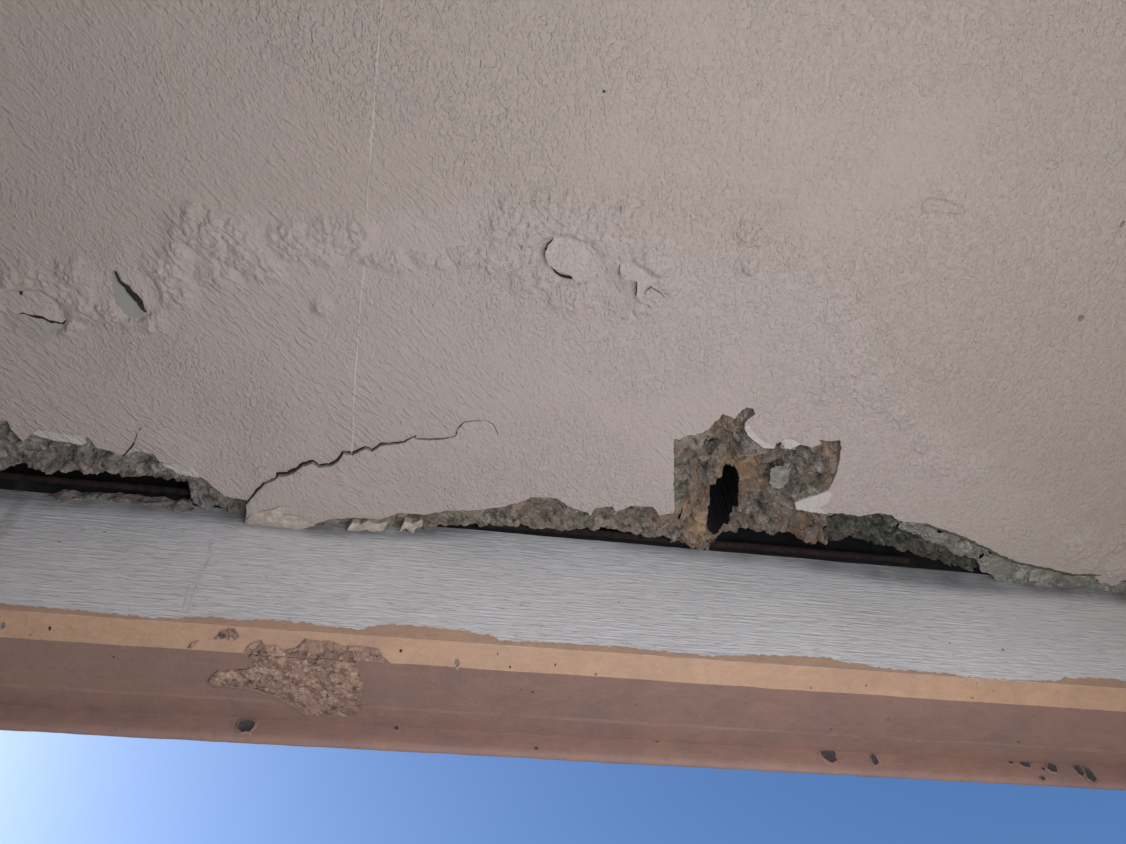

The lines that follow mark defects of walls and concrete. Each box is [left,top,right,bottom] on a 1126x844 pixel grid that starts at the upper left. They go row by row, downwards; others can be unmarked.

peeling [113,269,156,318]
peeling [541,238,669,310]
crack [246,421,498,504]
flaking render [0,407,1126,594]
corrosion [682,476,708,533]
flaking render [209,629,390,717]